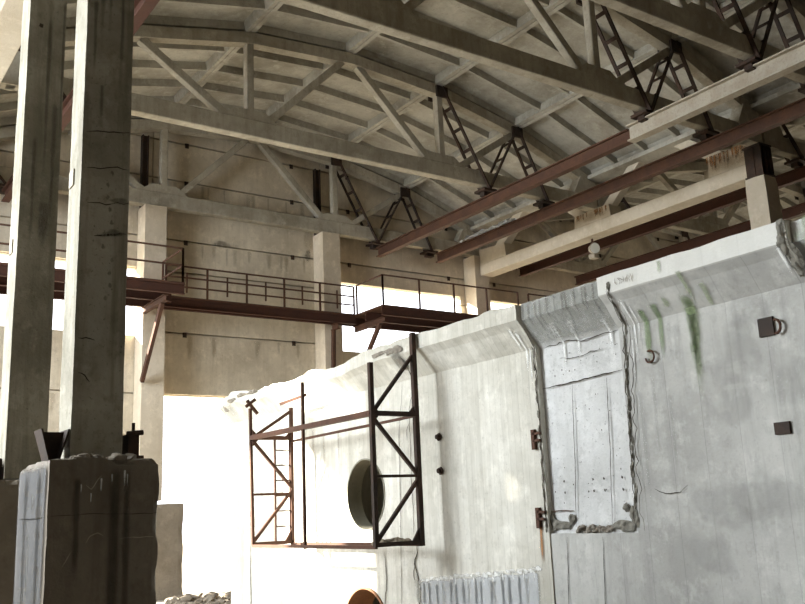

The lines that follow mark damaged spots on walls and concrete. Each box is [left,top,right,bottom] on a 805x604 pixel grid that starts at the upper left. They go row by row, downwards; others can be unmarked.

leakage [620,302,663,370]
leakage [676,272,701,371]
spalling [524,282,645,533]